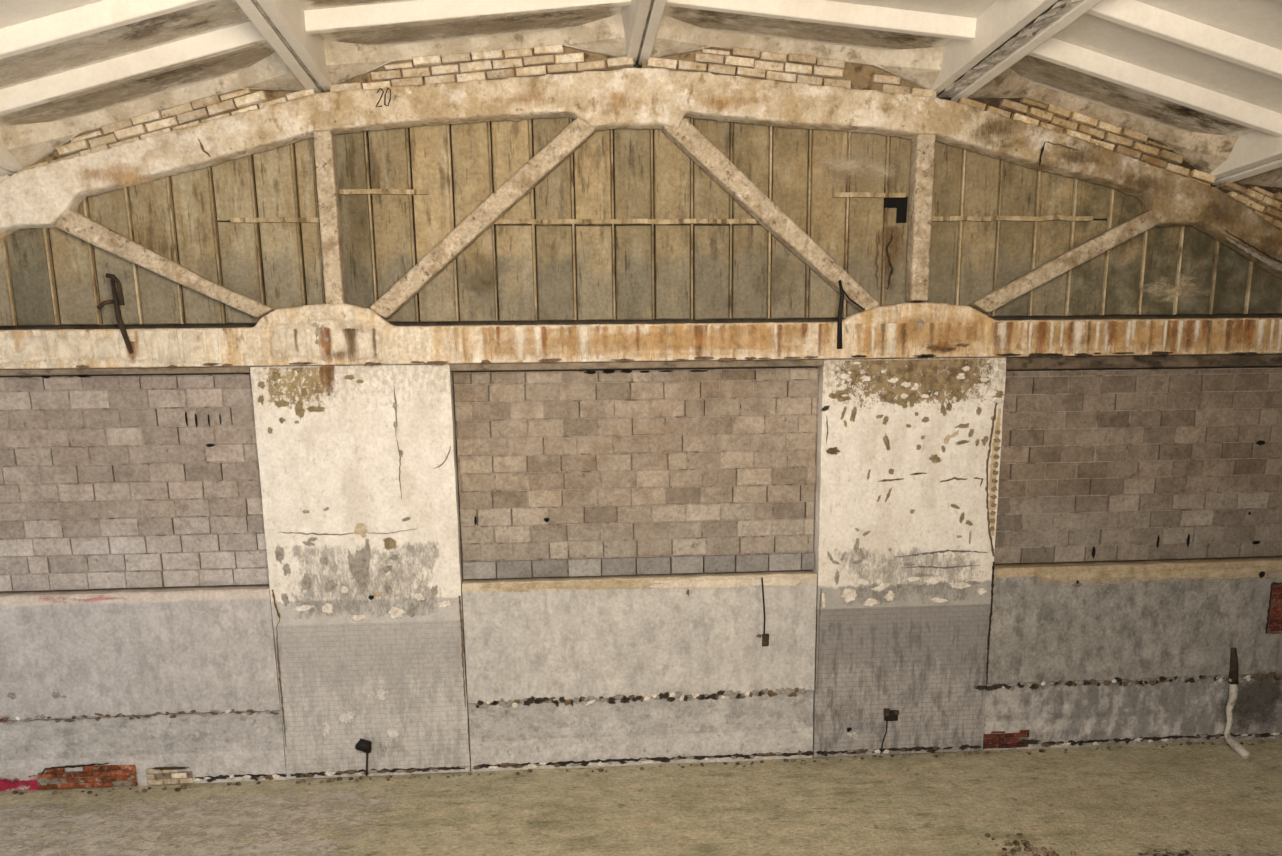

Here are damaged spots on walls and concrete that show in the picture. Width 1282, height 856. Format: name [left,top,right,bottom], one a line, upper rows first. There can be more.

leakage [0,6,245,87]
leakage [7,45,274,125]
leakage [332,4,610,45]
leakage [672,7,940,50]
leakage [1009,55,1246,135]
peeling [258,362,383,434]
corrosion [319,328,344,389]
corrosion [927,343,970,353]
peeling [822,351,1173,556]
peeling [275,523,452,619]
peeling [822,528,987,608]
flaking render [0,709,279,724]